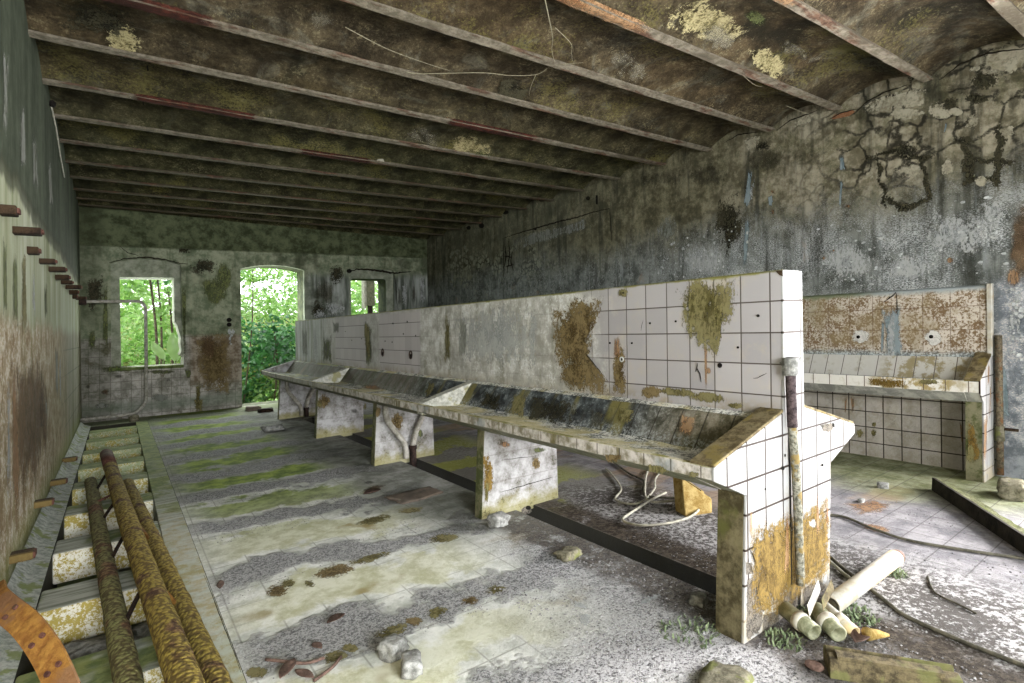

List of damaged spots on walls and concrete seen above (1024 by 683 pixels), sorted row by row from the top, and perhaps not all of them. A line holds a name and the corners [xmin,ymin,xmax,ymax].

water stain [850,52,900,77]
crack [939,48,1024,80]
crack [854,85,906,114]
crack [726,110,817,142]
spalling [898,164,922,177]
spalling [941,158,953,176]
water stain [707,141,780,261]
water stain [86,275,108,348]
water stain [148,288,232,411]
water stain [7,354,61,505]